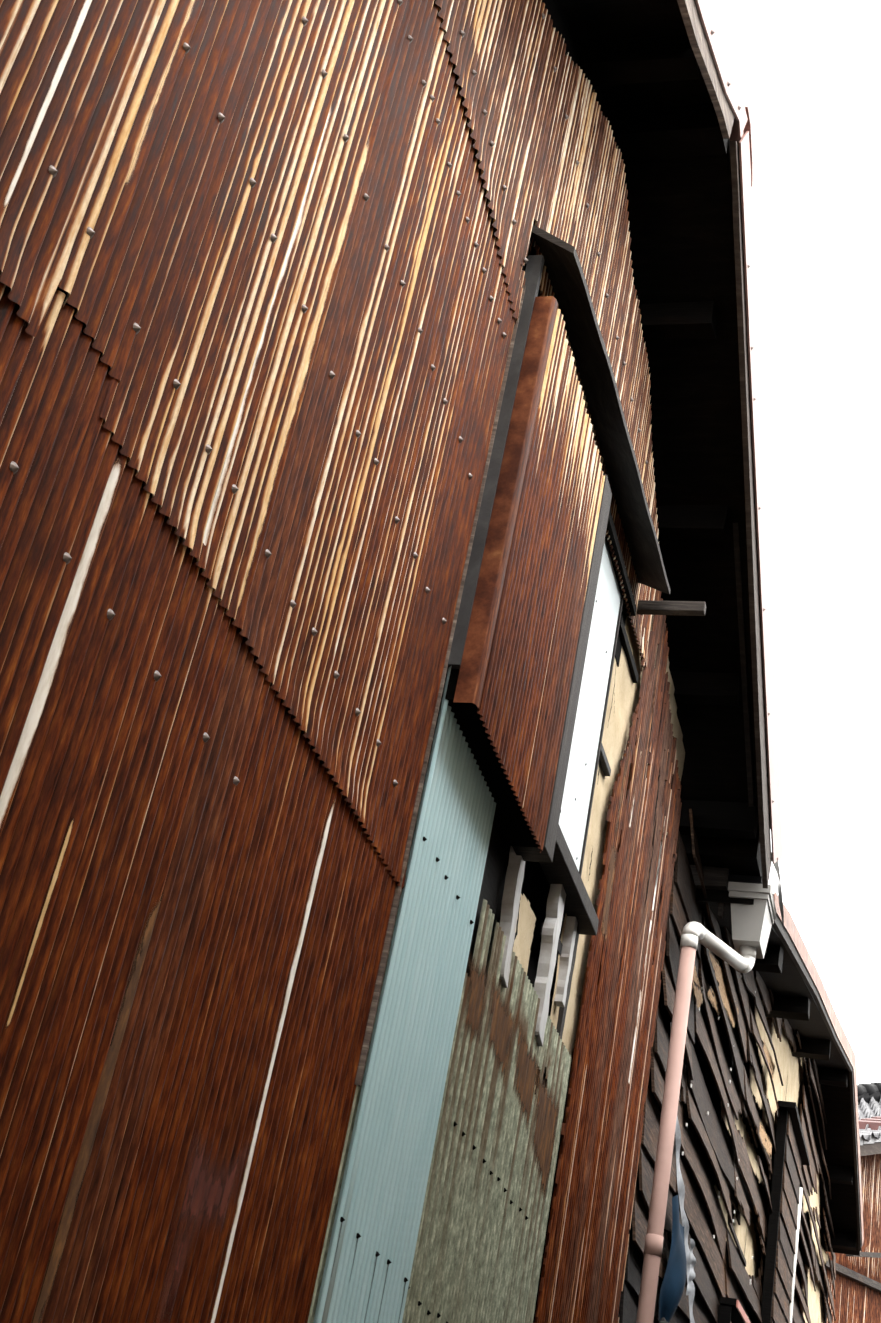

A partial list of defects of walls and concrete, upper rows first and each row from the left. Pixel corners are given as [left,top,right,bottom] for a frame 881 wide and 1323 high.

flaking render [581,615,685,912]
flaking render [550,915,592,1058]
flaking render [721,1001,804,1187]
flaking render [714,1184,760,1279]
flaking render [799,1173,830,1323]